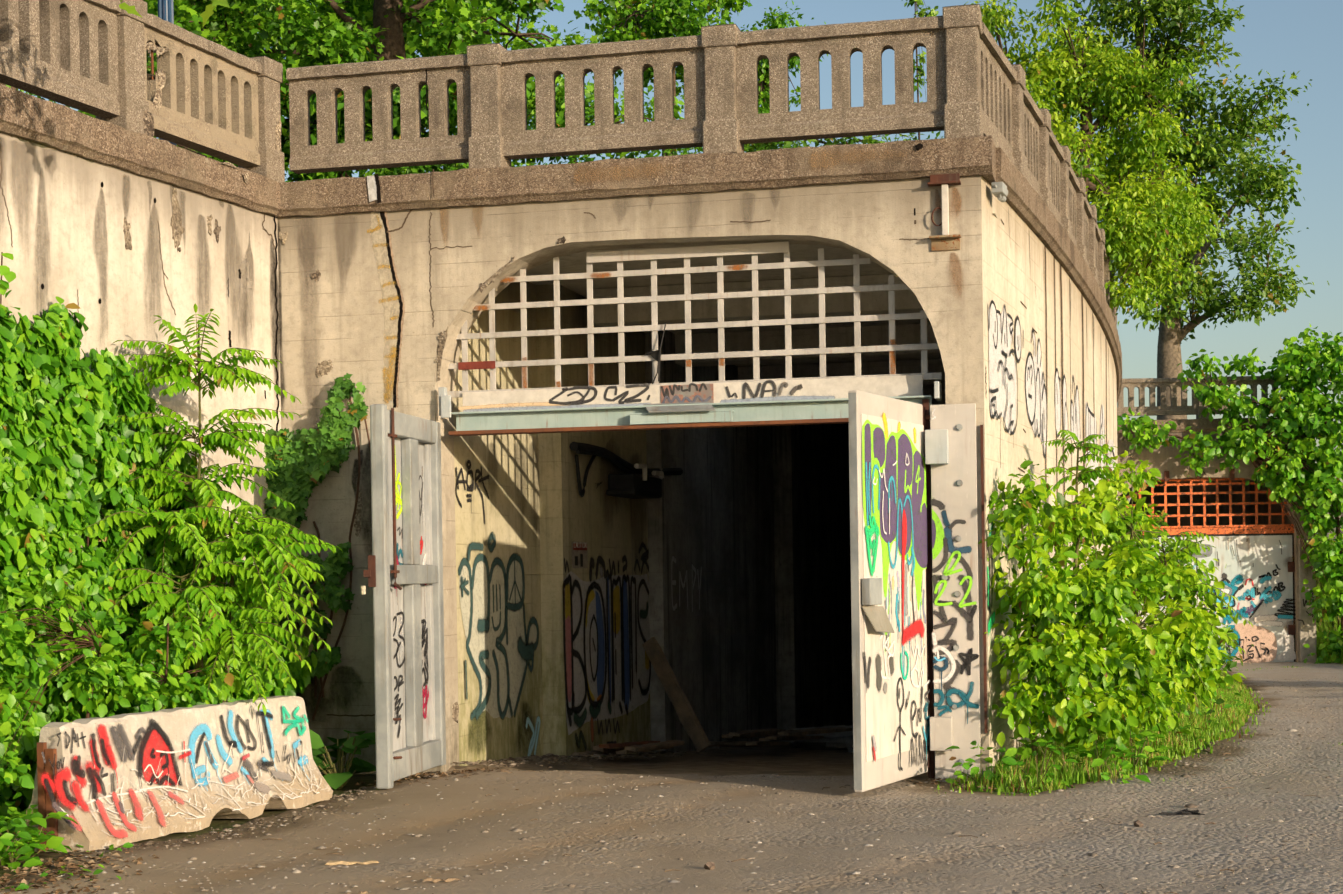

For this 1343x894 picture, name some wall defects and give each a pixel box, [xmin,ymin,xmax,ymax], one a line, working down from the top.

damp [1,141,46,298]
damp [95,190,107,302]
damp [148,187,158,305]
damp [199,215,209,298]
damp [221,200,253,325]
damp [270,224,285,405]
crack [374,169,472,408]